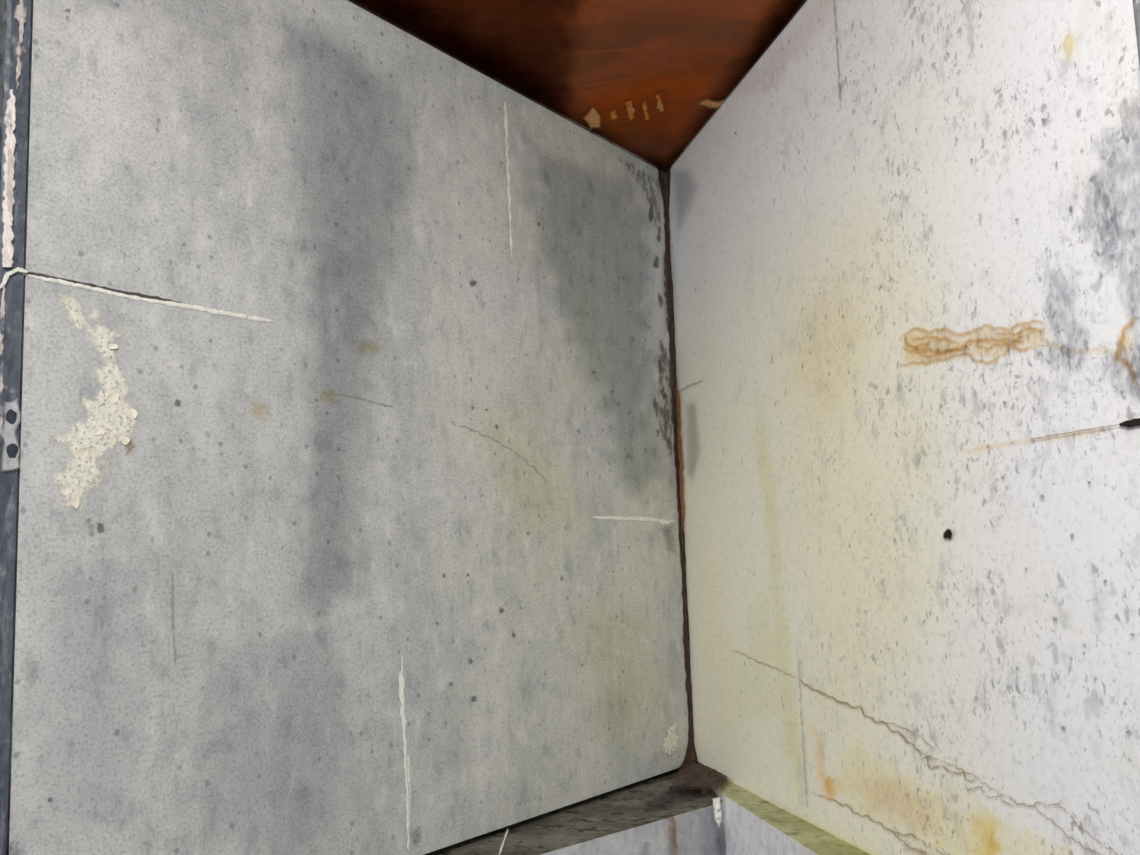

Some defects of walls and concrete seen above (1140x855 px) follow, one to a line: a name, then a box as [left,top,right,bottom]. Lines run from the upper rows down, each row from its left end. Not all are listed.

water stain [348,0,626,260]
peeling [584,95,664,128]
peeling [700,100,725,108]
crack [23,272,181,303]
peeling [53,295,138,511]
corrosion [658,166,698,767]
crack [735,651,1123,855]